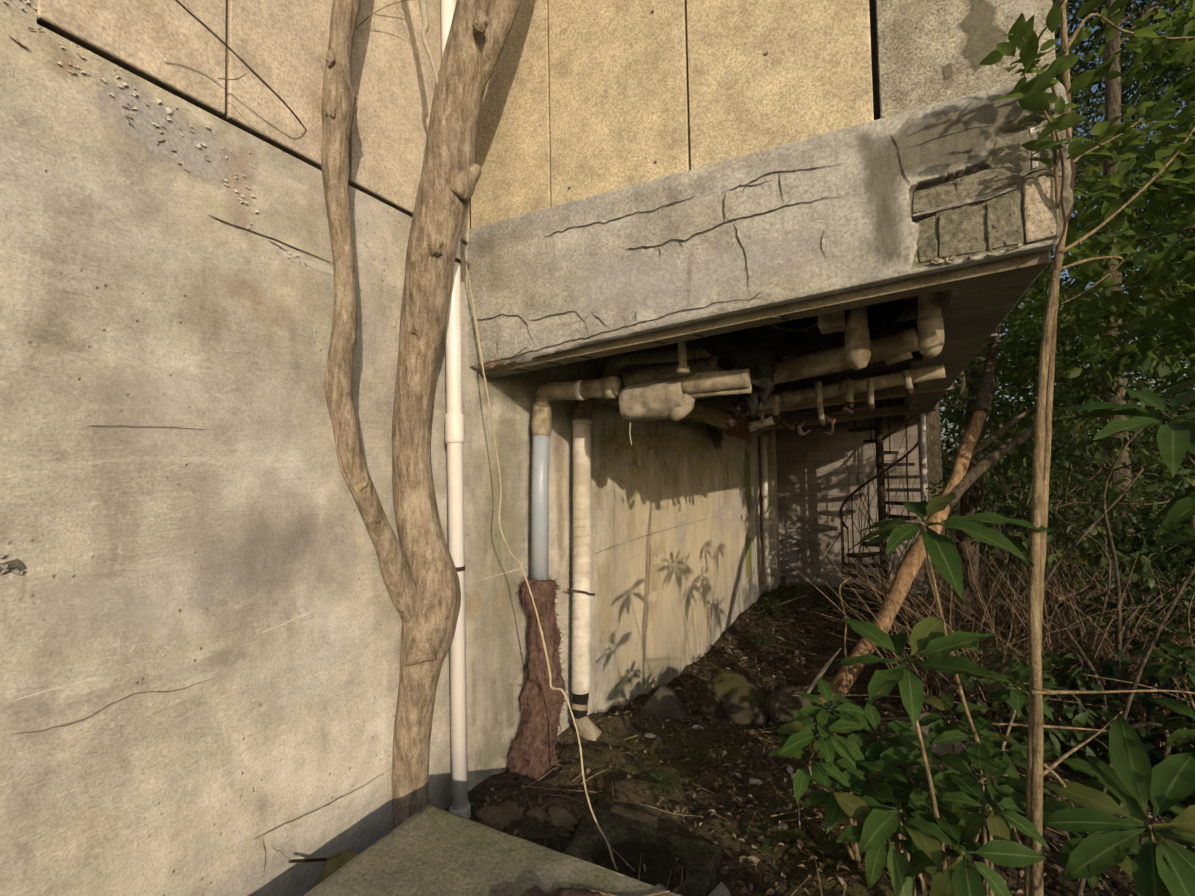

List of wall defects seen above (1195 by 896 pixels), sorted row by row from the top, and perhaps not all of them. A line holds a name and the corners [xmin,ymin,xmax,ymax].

damp [961,0,1008,70]
damp [943,63,953,79]
spalling [912,127,1061,265]
crack [207,214,331,263]
crack [477,163,846,364]
crack [93,423,210,431]
crack [14,676,220,734]
crack [253,768,391,876]